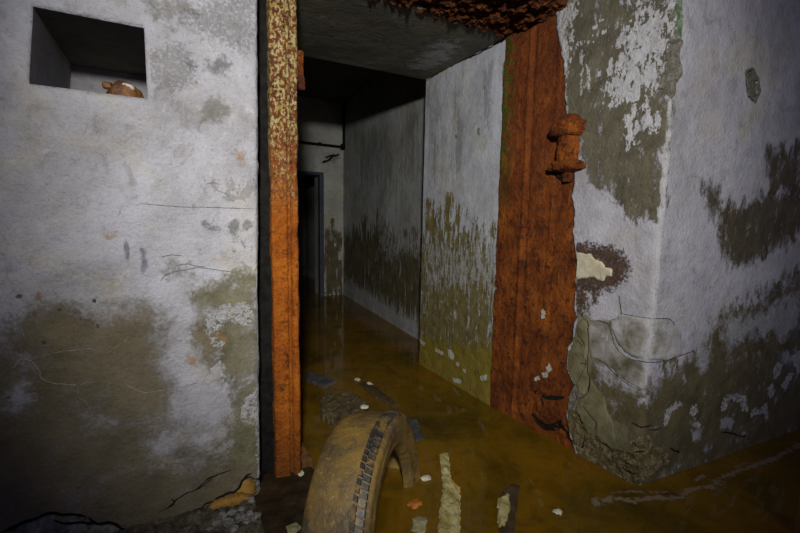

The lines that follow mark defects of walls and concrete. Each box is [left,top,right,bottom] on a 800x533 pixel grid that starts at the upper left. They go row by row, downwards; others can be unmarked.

peeling [557,0,683,152]
leakage [324,192,497,406]
flaking render [576,252,613,281]
leakage [700,138,800,267]
leakage [0,269,259,532]
leakage [567,265,800,496]
crack [0,511,125,533]
crack [160,468,264,512]